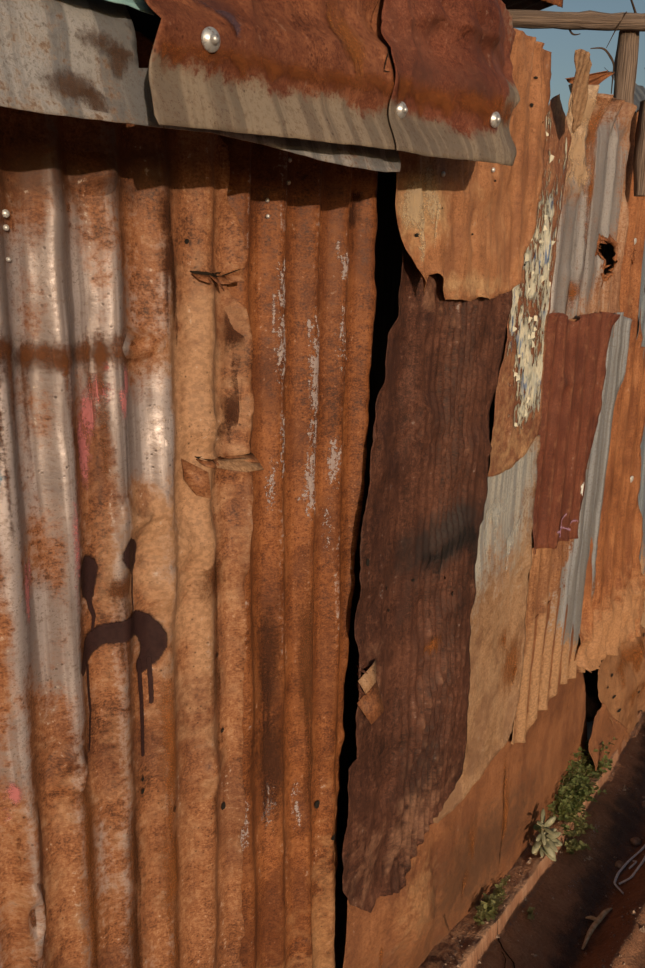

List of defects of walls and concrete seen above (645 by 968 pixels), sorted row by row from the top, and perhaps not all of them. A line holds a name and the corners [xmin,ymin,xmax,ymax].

corrosion [398,77,512,123]
corrosion [160,201,178,338]
corrosion [224,315,244,344]
corrosion [349,192,361,227]
peeling [506,95,597,430]
corrosion [0,334,136,454]
peeling [196,453,260,469]
corrosion [217,361,241,443]
corrosion [204,560,221,634]
corrosion [259,613,283,817]
corrosion [83,790,99,956]
corrosion [127,820,142,968]